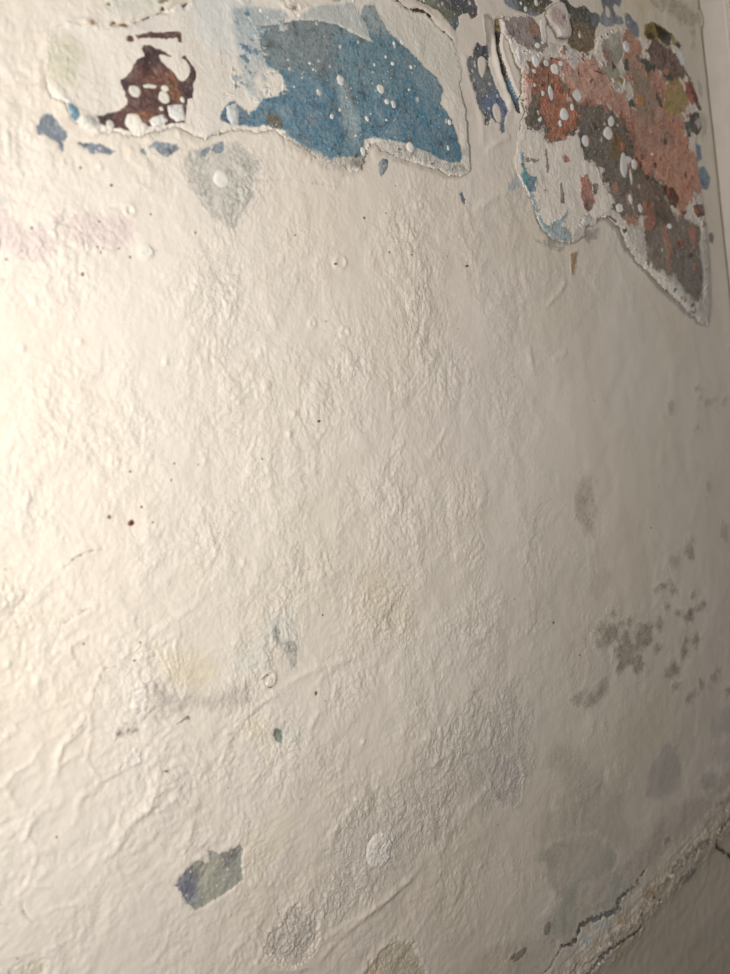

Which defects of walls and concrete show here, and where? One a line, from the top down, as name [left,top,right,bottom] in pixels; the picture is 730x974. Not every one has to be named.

flaking render [36,0,711,326]
water stain [339,546,424,650]
water stain [436,531,730,974]
spalling [174,845,244,911]
crack [542,798,730,974]